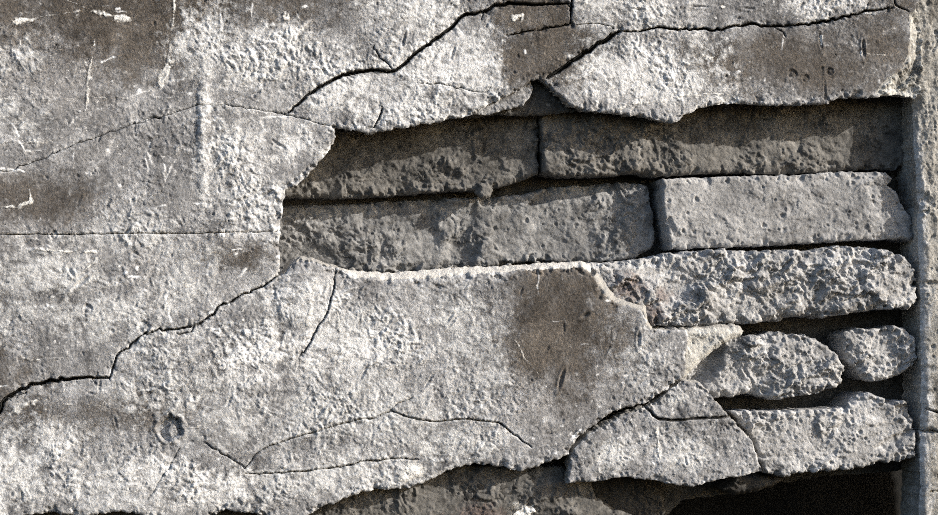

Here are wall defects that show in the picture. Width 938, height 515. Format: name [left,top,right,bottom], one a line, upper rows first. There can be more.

crack [57,0,909,152]
flaking render [452,79,674,124]
crack [0,275,279,413]
crack [206,400,530,474]
spalling [278,256,743,483]
spalling [709,466,785,494]